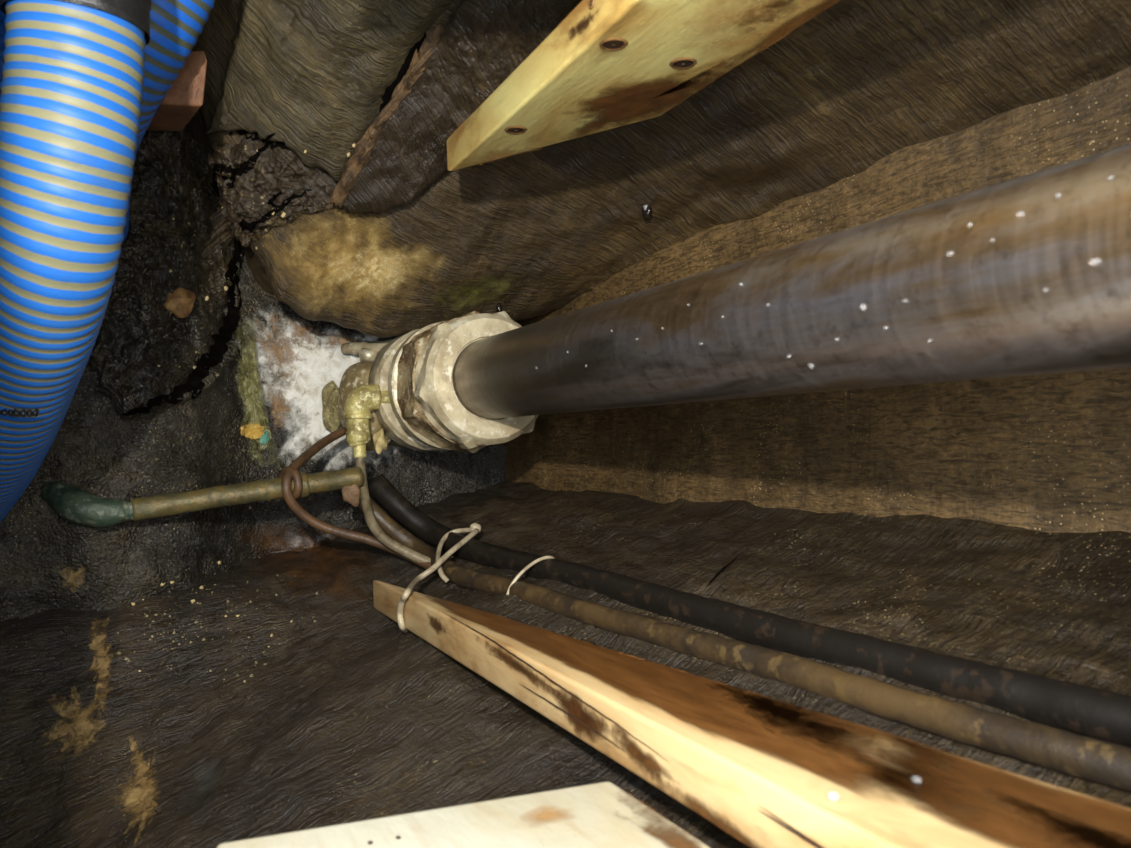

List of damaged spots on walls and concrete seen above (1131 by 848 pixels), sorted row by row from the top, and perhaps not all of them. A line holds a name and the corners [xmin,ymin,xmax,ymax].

crack [210,130,288,198]
crack [121,170,329,416]
damp [352,252,391,289]
damp [252,316,378,469]